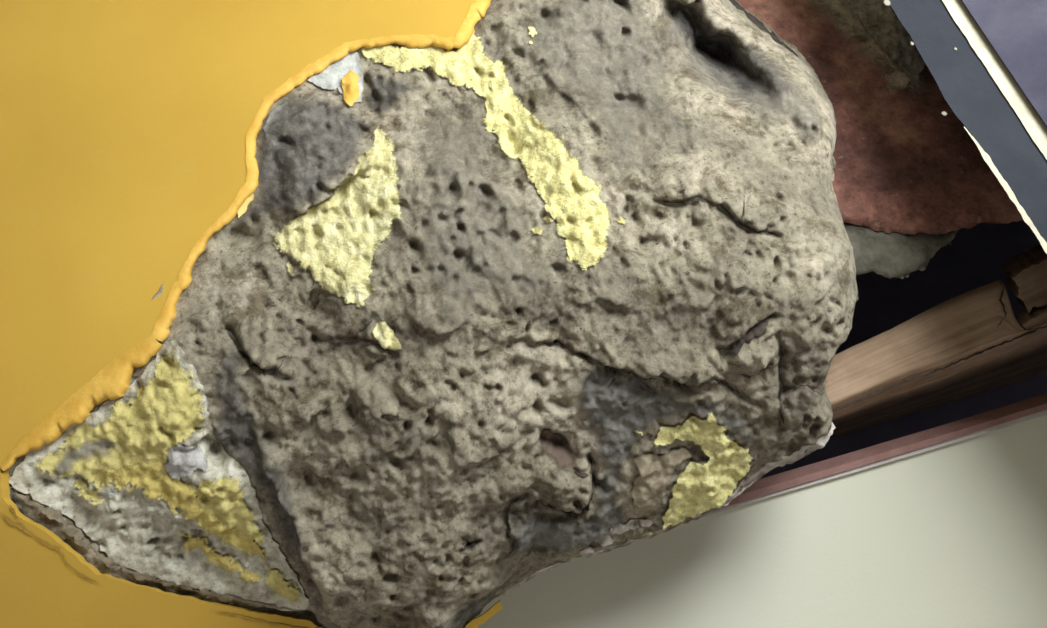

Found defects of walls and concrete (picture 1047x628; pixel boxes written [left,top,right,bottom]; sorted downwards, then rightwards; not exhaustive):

peeling [361,35,611,270]
peeling [274,126,402,308]
crack [663,197,778,235]
spalling [835,126,1047,355]
crack [228,331,289,380]
crack [317,321,396,353]
peeling [372,321,401,351]
crack [513,315,828,424]
peeling [8,339,309,611]
crack [462,540,480,551]
crack [505,454,602,558]
peeling [654,412,753,529]